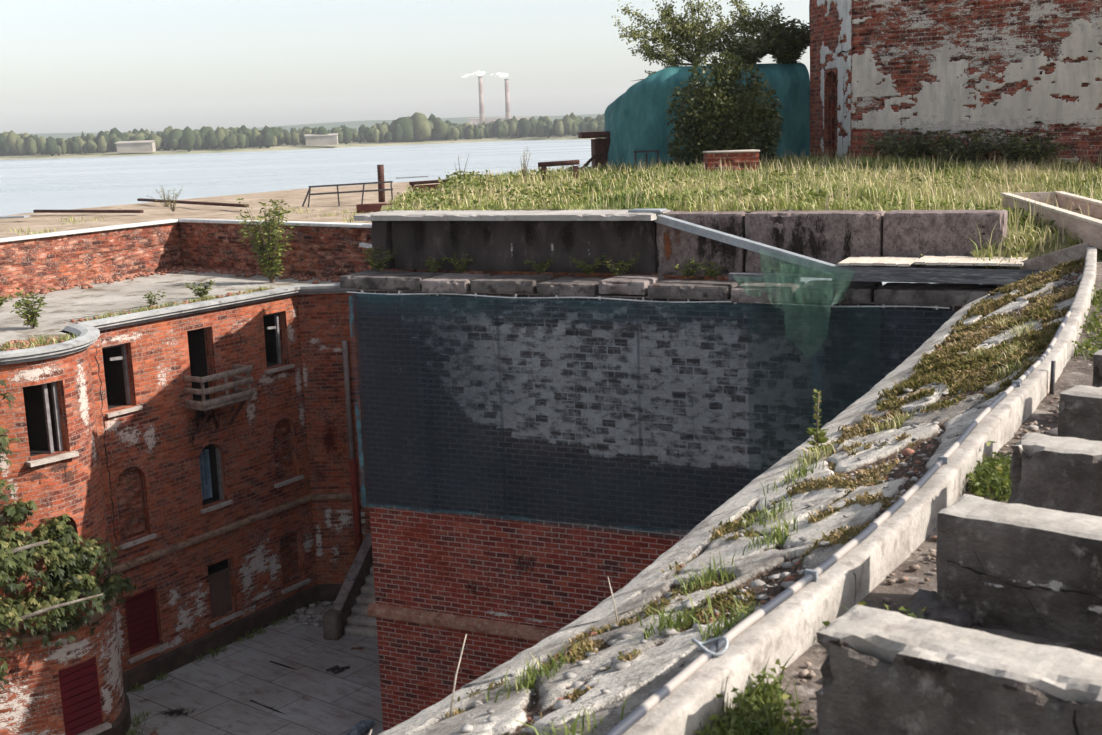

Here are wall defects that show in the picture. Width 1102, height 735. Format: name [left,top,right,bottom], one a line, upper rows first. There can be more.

flaking render [817,0,1102,166]
peeling [0,607,125,735]
peeling [150,583,210,654]
peeling [237,536,281,615]